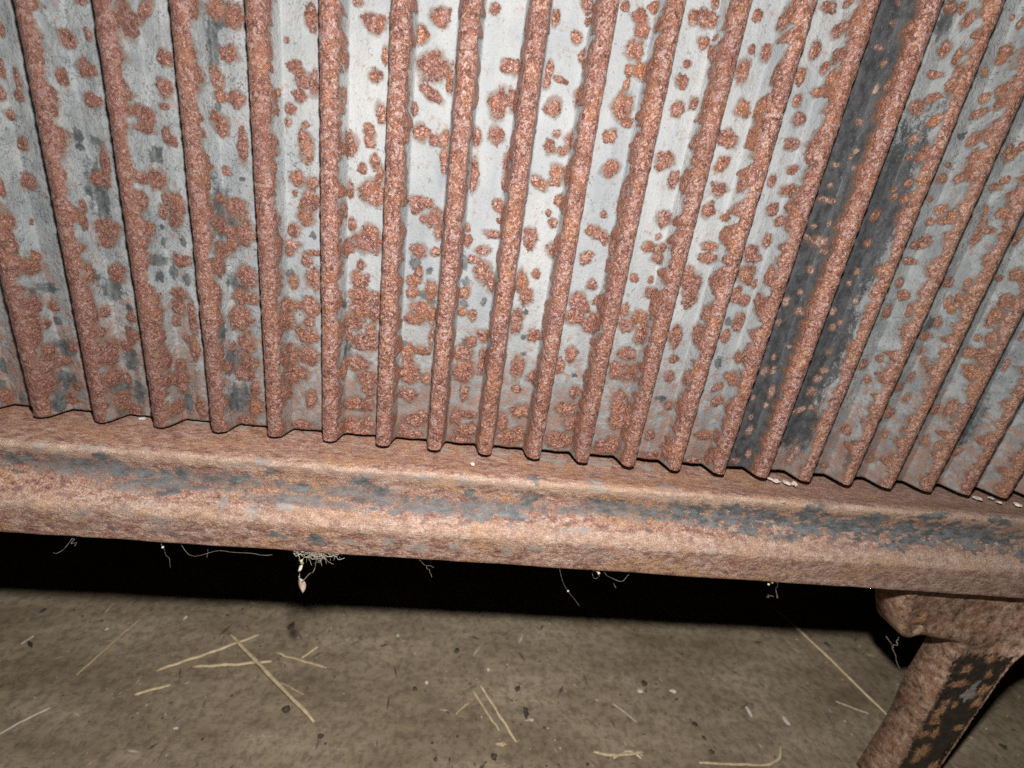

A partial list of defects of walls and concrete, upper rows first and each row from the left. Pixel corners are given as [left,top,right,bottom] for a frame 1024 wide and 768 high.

corrosion [0,0,1024,498]
corrosion [909,653,998,768]